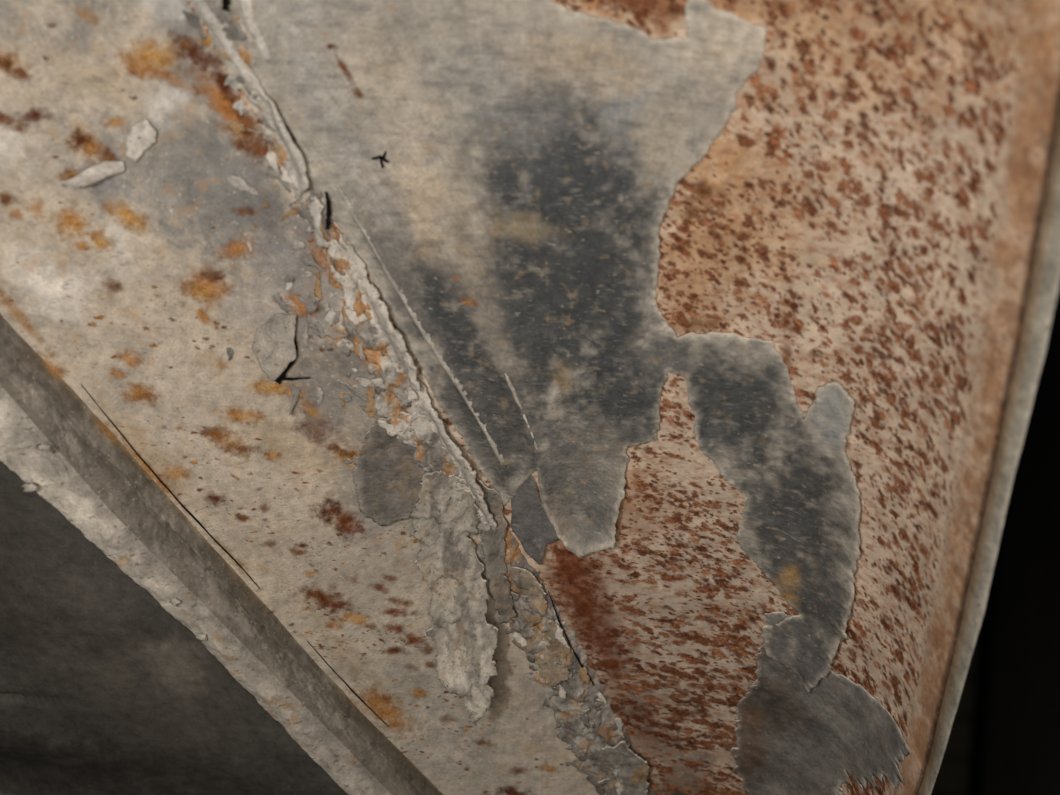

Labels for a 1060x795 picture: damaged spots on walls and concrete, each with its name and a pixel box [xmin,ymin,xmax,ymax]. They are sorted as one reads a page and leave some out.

corrosion [0,110,41,131]
peeling [59,161,126,187]
corrosion [74,133,116,161]
crack [324,192,332,230]
crack [275,319,310,384]
peeling [181,0,912,795]
crack [81,385,260,589]
corrosion [133,417,286,542]
corrosion [291,500,385,570]
corrosion [305,576,433,667]
crack [548,591,594,685]
crack [307,641,389,727]